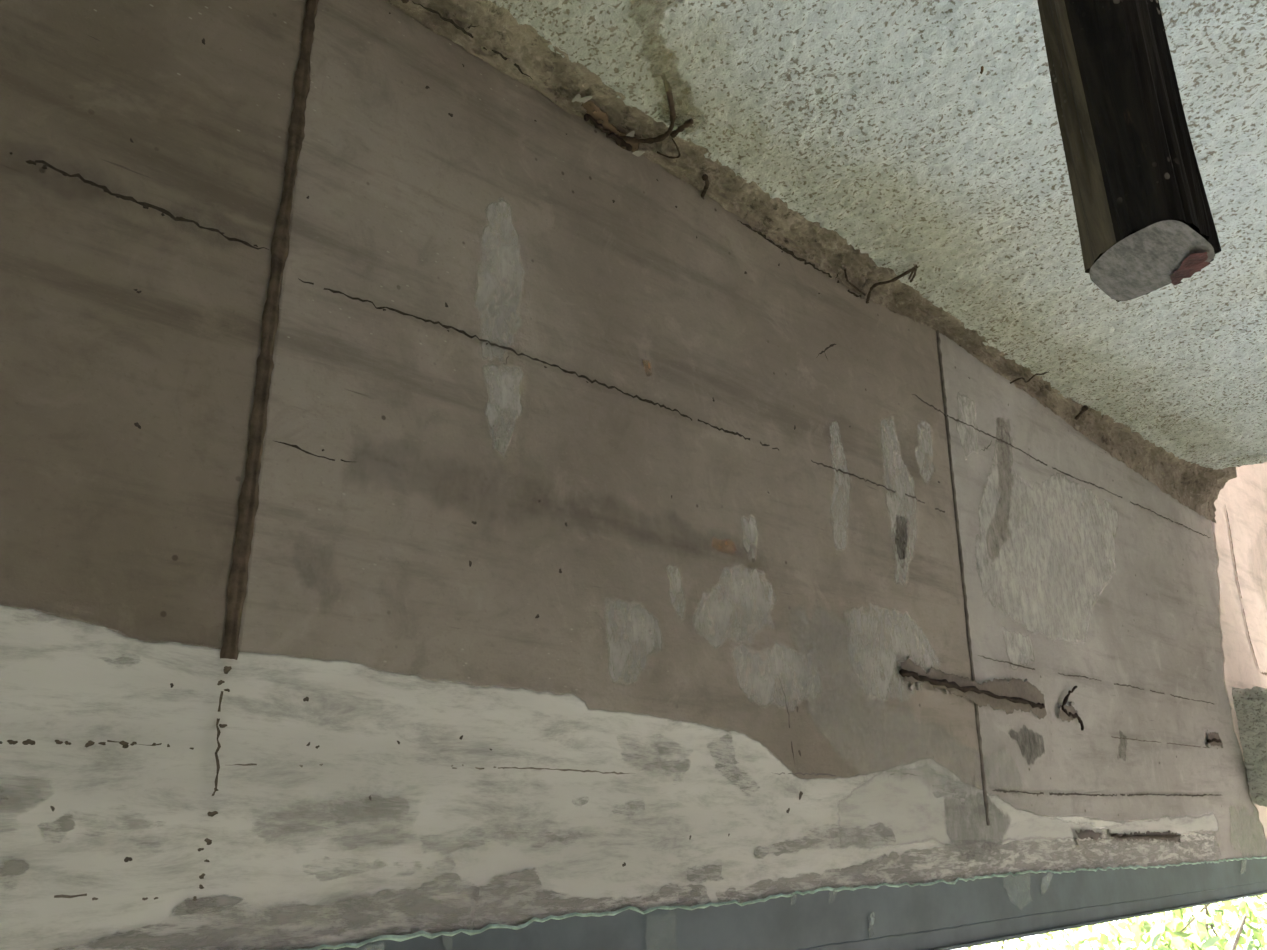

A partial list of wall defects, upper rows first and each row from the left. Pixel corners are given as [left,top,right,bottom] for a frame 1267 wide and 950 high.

crack [9,152,269,250]
crack [298,278,779,450]
crack [811,460,945,513]
crack [912,394,1267,676]
spalling [896,656,1084,731]
crack [978,655,1213,704]
crack [0,666,257,901]
crack [451,764,635,775]
spalling [1206,732,1224,748]
peeling [41,816,74,832]
peeling [0,861,28,876]
peeling [55,823,1221,950]